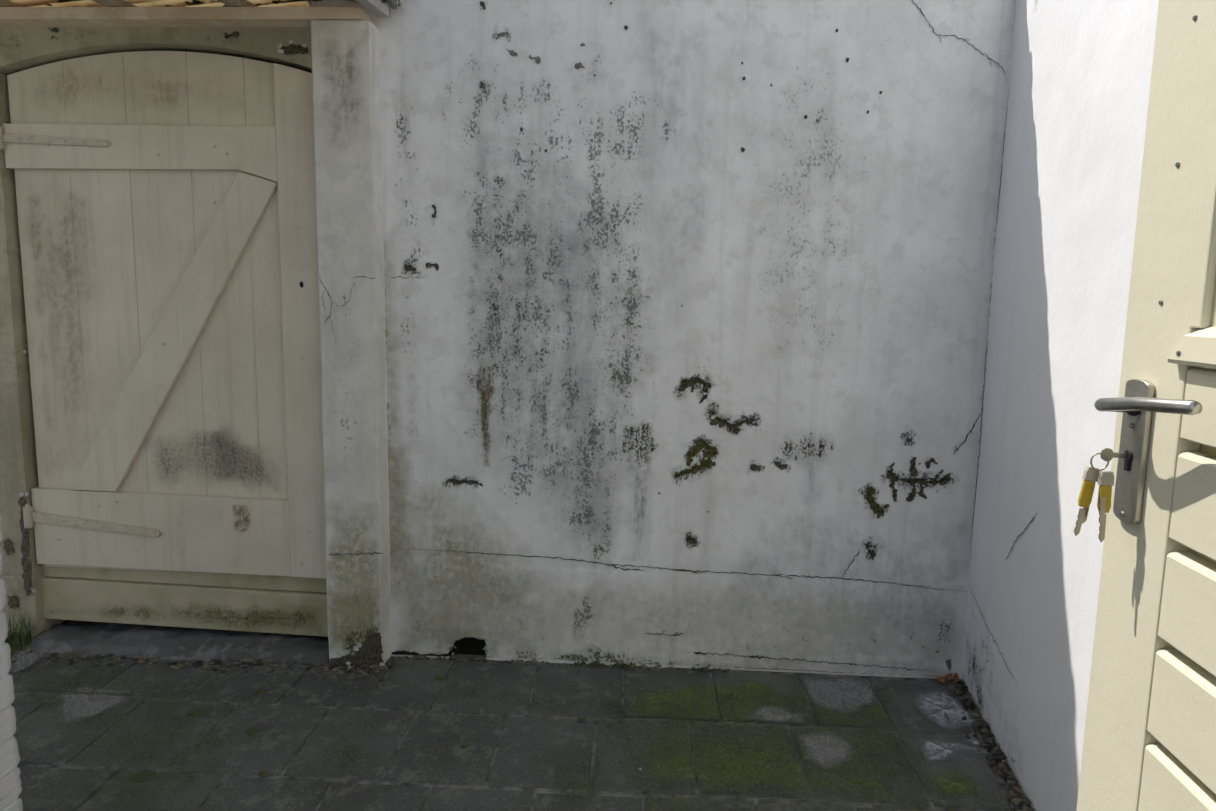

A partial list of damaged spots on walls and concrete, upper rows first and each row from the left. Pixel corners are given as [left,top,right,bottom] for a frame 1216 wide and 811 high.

spalling [329,633,491,666]
leakage [447,70,662,565]
crack [320,0,1018,685]
leakage [780,433,833,460]